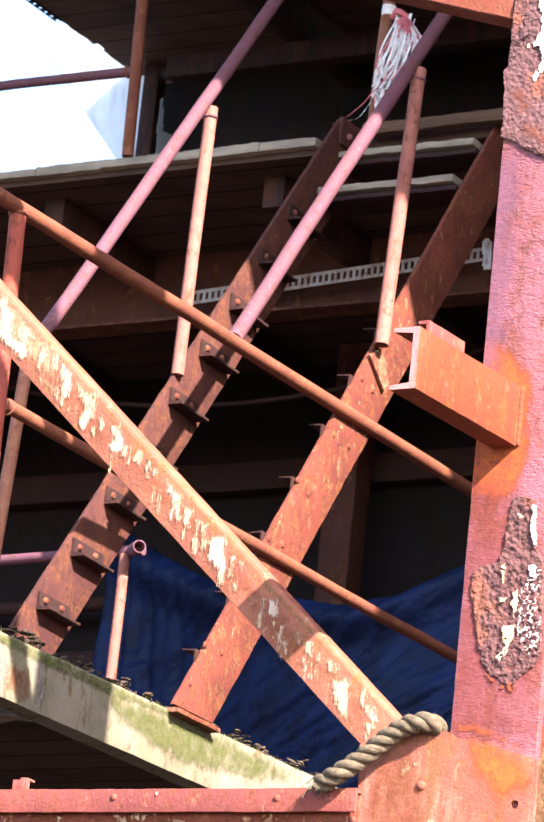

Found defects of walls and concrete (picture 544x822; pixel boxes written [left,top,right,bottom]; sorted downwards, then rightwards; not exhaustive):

peeling [501,0,544,155]
peeling [0,289,244,591]
corrosion [472,342,531,498]
peeling [517,504,537,546]
peeling [256,597,378,741]
peeling [496,563,542,661]
corrosion [471,742,530,798]
peeling [536,734,544,822]